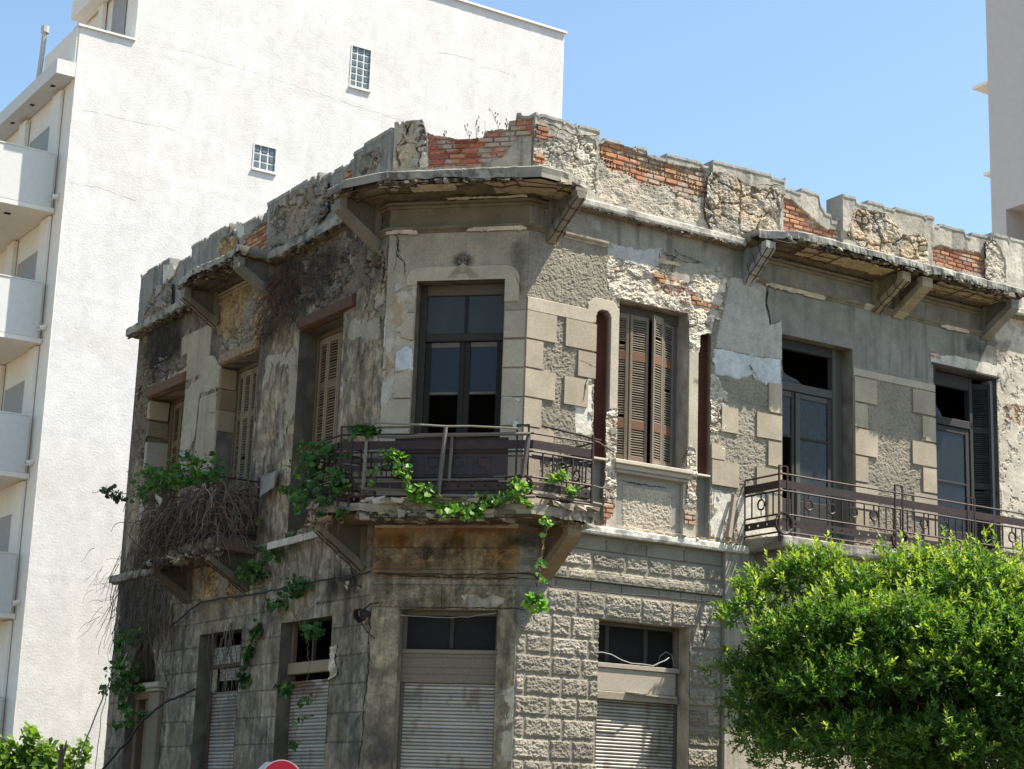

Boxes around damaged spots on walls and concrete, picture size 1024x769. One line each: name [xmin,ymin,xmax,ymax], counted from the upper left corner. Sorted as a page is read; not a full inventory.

crack [394,234,405,274]
flaking render [127,119,1024,470]
crack [766,287,779,324]